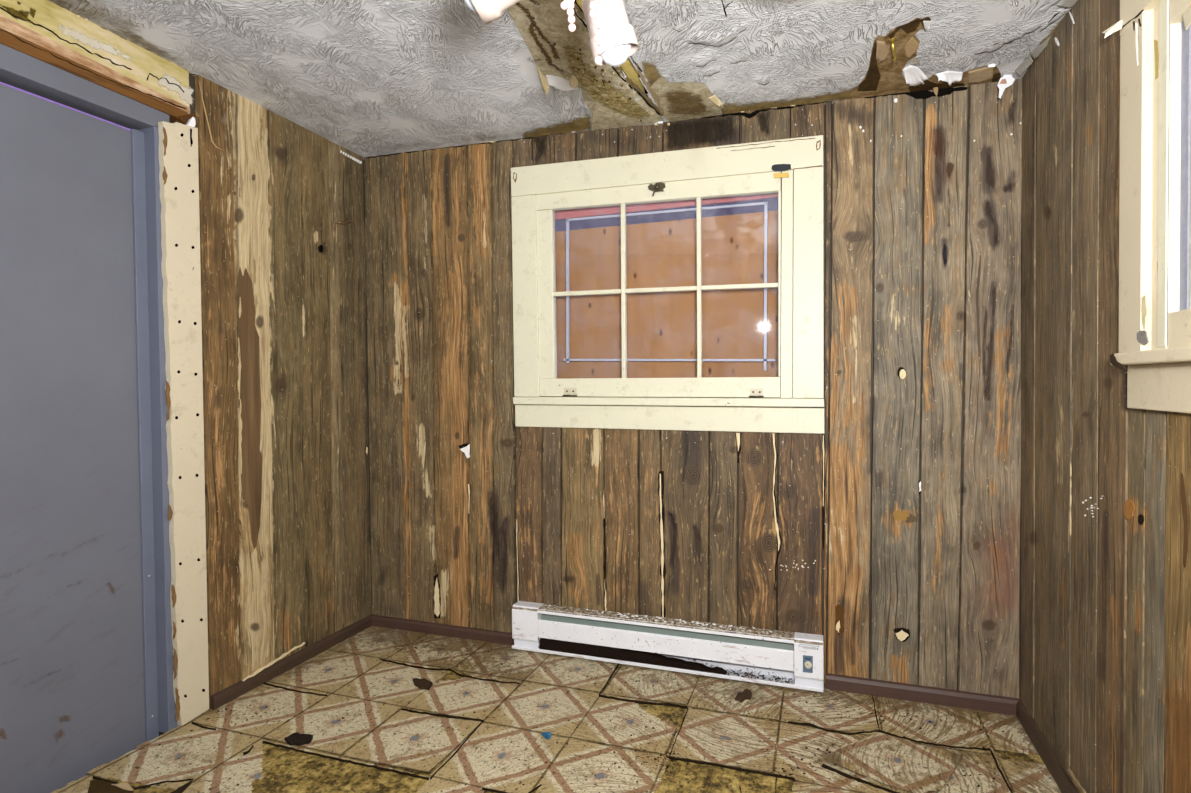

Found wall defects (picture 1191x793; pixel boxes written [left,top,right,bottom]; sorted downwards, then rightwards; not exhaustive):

peeling [59,25,129,59]
peeling [158,73,196,127]
spalling [554,43,670,126]
water stain [508,0,850,155]
peeling [850,17,1001,99]
peeling [1015,0,1078,76]
peeling [250,741,429,793]
peeling [651,753,793,793]
peeling [993,722,1051,789]